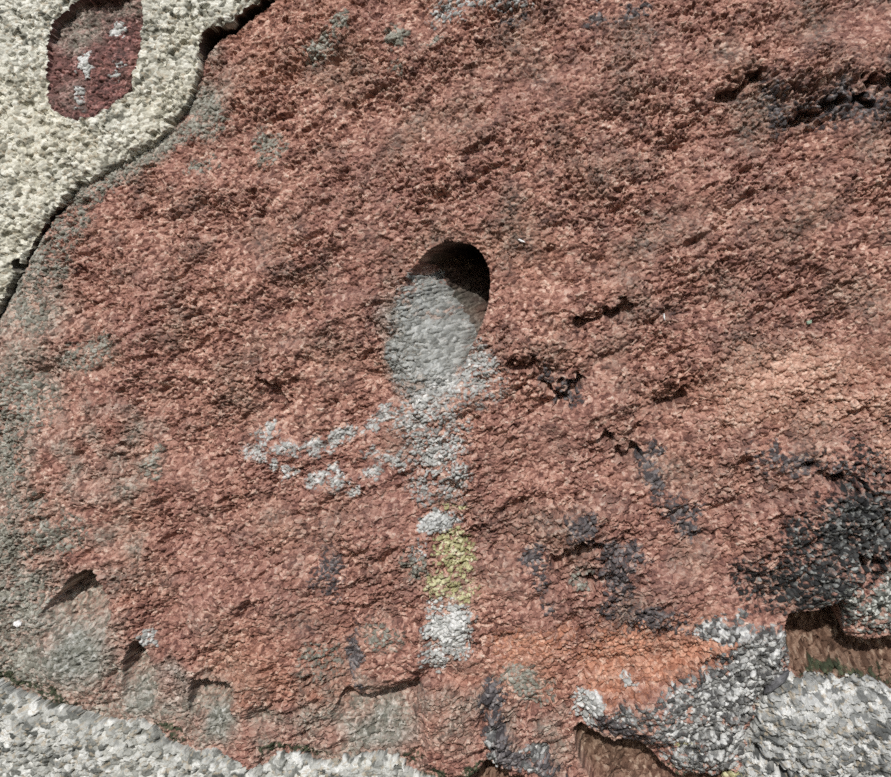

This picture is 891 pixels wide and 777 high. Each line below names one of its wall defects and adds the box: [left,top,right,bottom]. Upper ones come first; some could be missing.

crack [199,0,276,63]
spalling [422,243,492,342]
spalling [764,599,891,694]
spalling [574,722,734,777]